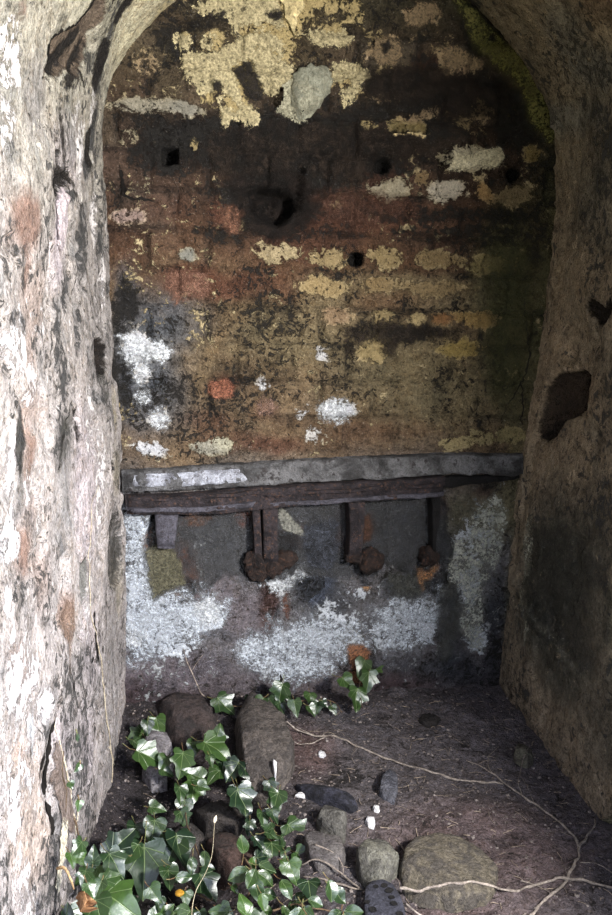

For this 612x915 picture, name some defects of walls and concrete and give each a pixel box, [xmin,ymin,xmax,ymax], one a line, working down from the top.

spalling [42,0,107,91]
peeling [172,0,355,129]
peeling [329,34,402,109]
peeling [406,1,442,28]
peeling [442,43,485,74]
peeling [447,147,505,172]
damp [117,335,170,404]
spalling [538,370,592,441]
damp [125,515,230,665]
damp [238,495,508,683]
rust [417,566,438,589]
crack [40,612,100,892]